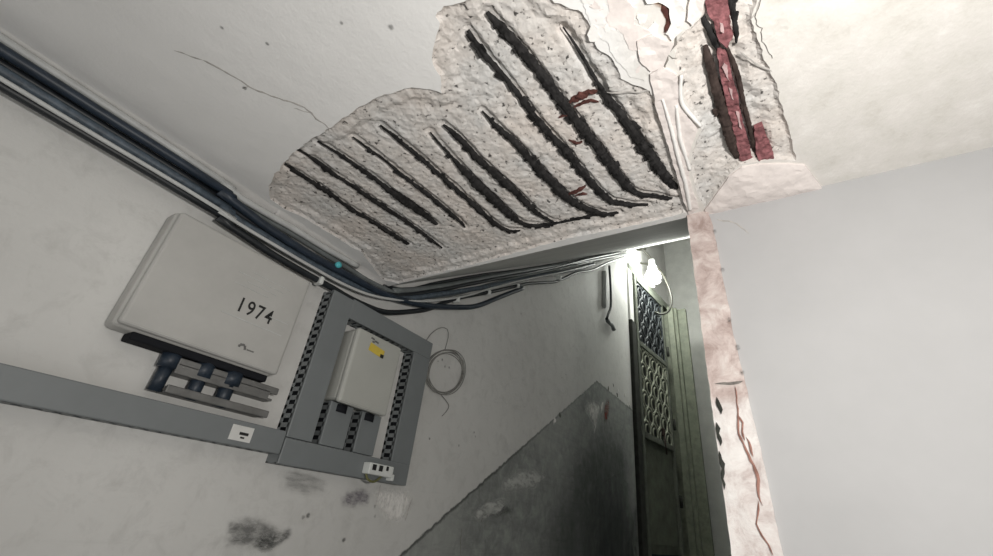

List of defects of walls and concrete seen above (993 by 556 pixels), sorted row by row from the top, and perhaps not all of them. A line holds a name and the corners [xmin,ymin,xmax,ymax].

crack [176,51,328,128]
spalling [269,0,801,283]
corrosion [559,89,599,118]
crack [715,381,773,555]